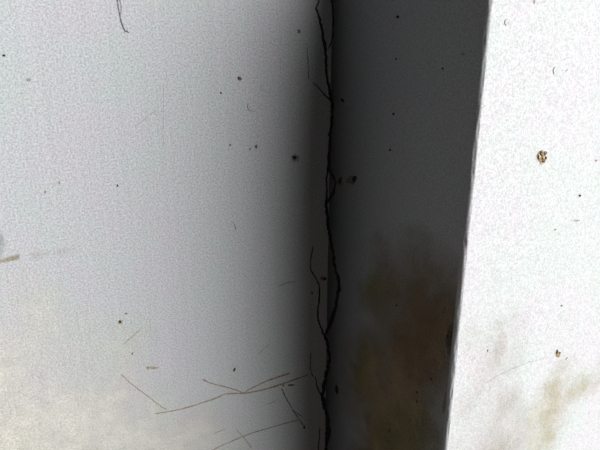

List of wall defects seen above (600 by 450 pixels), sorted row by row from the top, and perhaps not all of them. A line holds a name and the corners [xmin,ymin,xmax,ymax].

crack [121,0,341,450]
leakage [353,262,455,450]